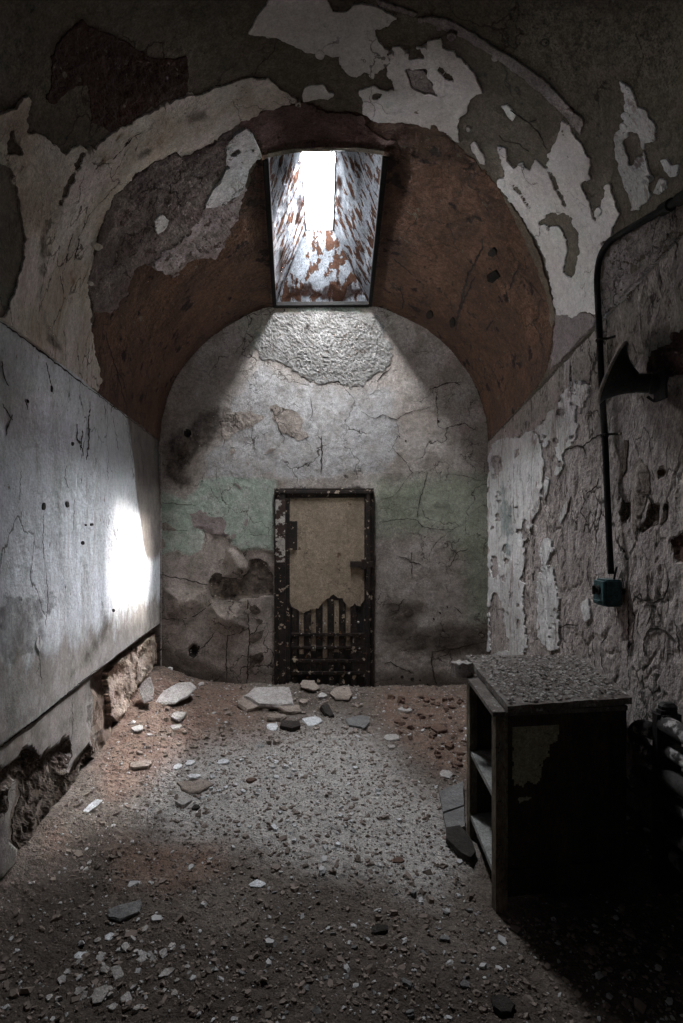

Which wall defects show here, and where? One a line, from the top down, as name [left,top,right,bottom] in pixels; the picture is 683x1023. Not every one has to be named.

rust [287,281,361,301]
flaking render [0,0,683,704]
crack [0,322,155,525]
leakage [167,408,221,485]
crack [310,397,323,470]
crack [542,434,601,457]
crack [557,478,599,545]
flaking render [101,634,157,722]
crack [201,599,259,684]
crack [600,580,681,686]
flaking render [0,739,96,849]
peeling [83,799,102,813]